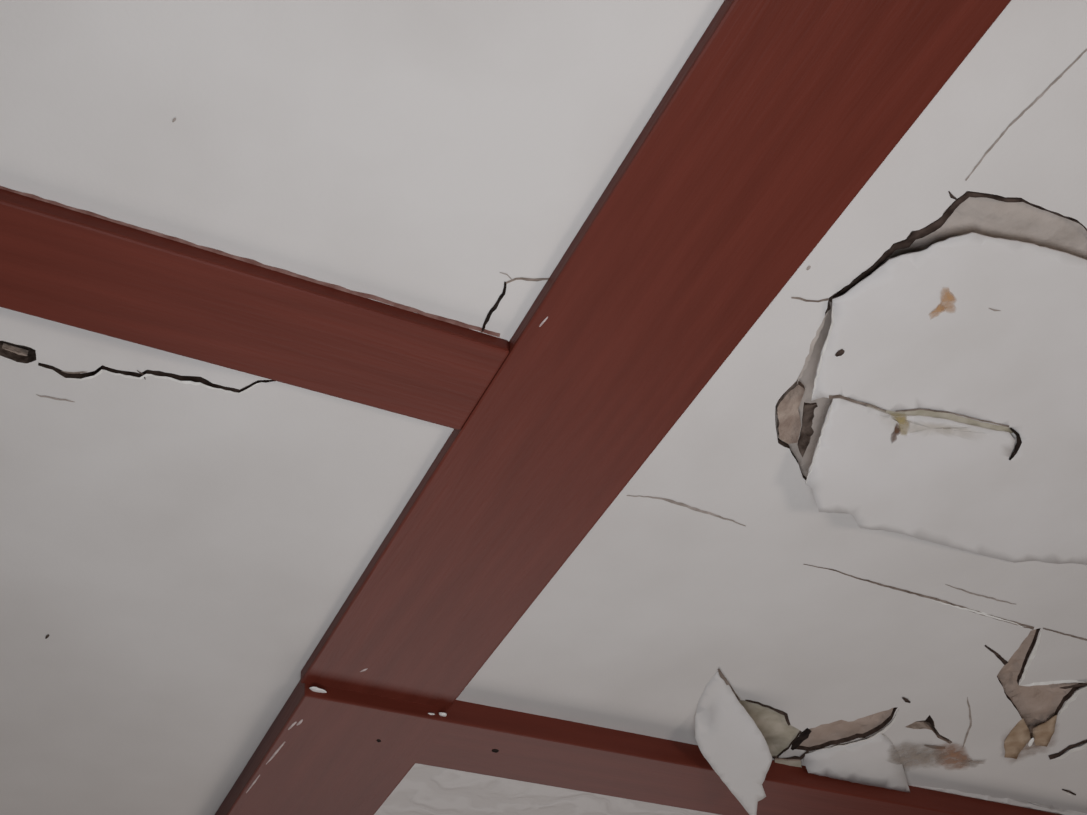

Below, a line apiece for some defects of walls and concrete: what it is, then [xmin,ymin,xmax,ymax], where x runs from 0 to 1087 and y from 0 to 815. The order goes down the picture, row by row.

crack [965,49,1087,181]
crack [480,272,549,332]
crack [0,341,274,402]
peeling [775,191,1087,565]
crack [803,564,1087,641]
peeling [695,669,802,815]
spalling [915,785,1087,815]